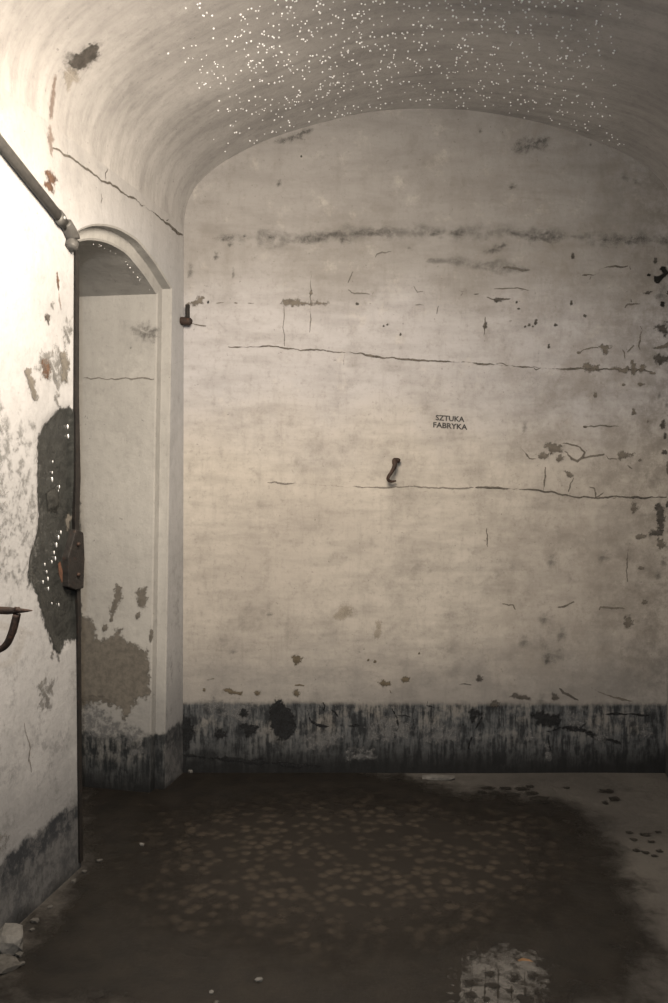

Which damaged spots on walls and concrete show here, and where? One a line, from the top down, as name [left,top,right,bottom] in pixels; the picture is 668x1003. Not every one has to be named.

crack [53,147,183,235]
spalling [282,281,327,332]
crack [229,301,652,372]
peeling [25,317,153,720]
crack [356,486,667,499]
crack [583,451,642,469]
damp [0,704,666,1003]